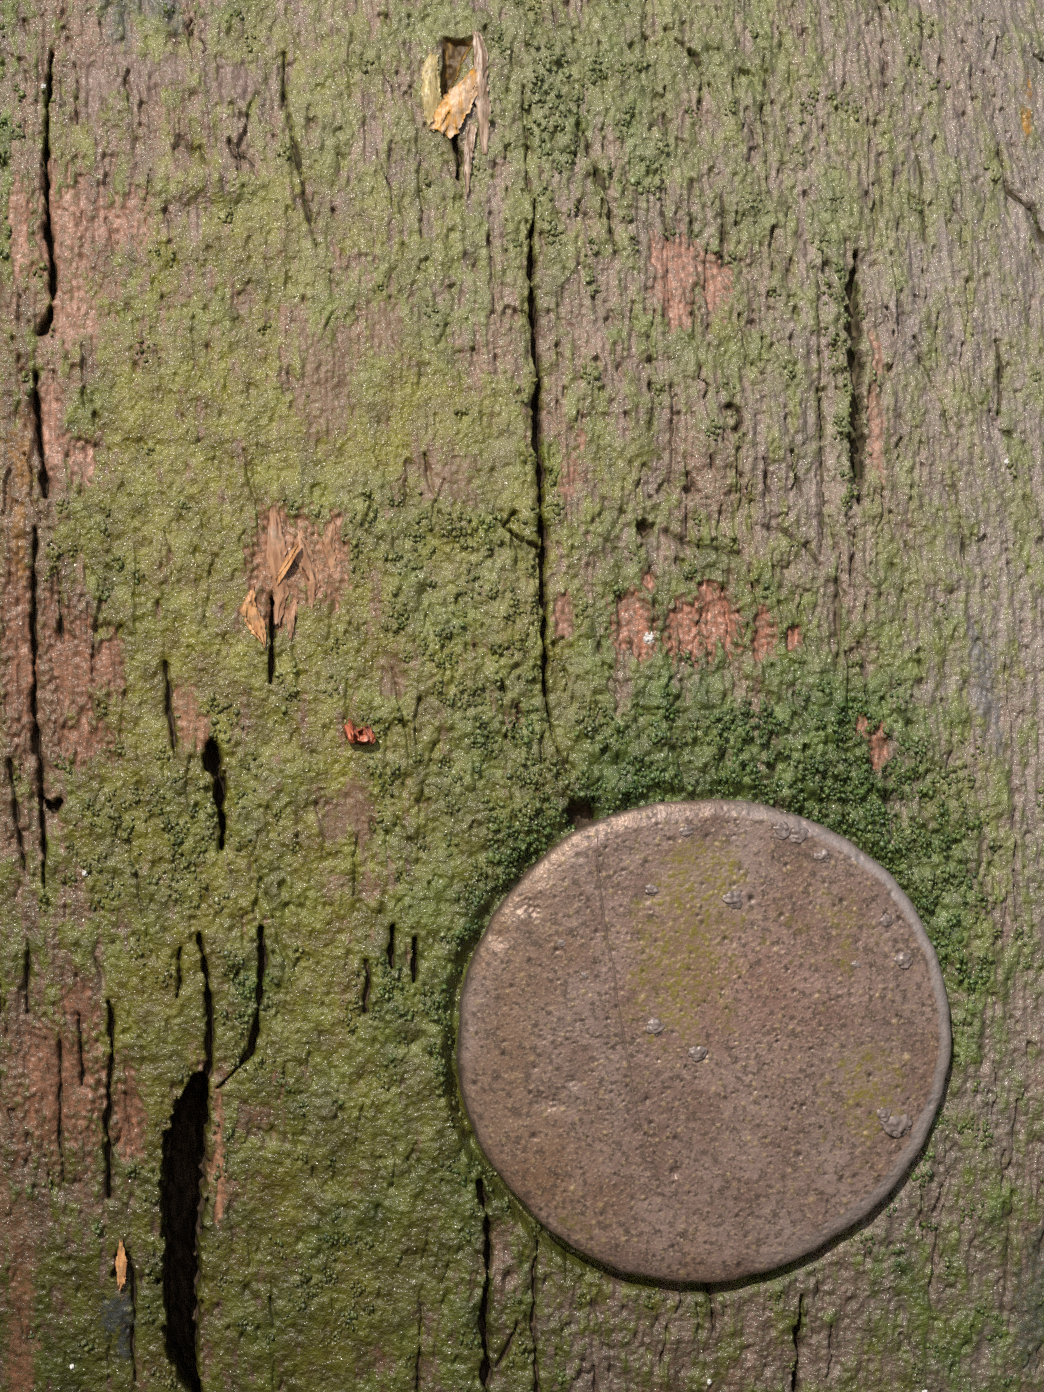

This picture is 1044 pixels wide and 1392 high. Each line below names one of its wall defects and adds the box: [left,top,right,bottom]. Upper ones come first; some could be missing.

crack [39,62,56,336]
peeling [420,51,478,140]
crack [33,373,50,498]
peeling [239,504,352,647]
crack [503,88,568,773]
crack [664,531,732,554]
crack [766,254,866,670]
crack [9,530,63,883]
crack [164,662,225,848]
crack [129,926,268,1392]
crack [476,1179,541,1392]
crack [791,1301,802,1392]